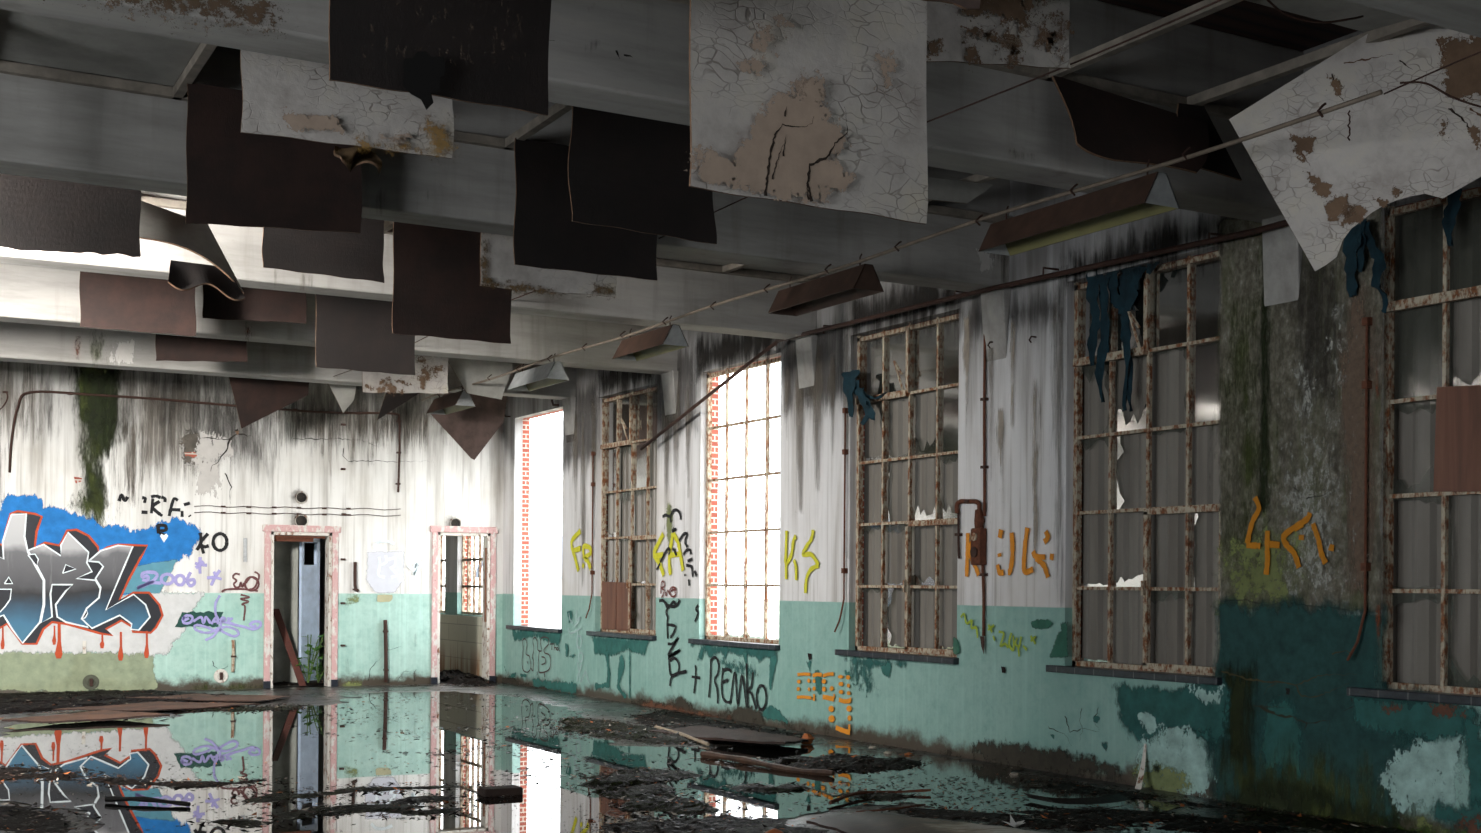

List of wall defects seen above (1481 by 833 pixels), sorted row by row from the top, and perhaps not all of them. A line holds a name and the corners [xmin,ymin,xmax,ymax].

peeling [684,67,861,206]
crack [764,107,848,202]
peeling [945,0,1076,70]
crack [1331,38,1481,143]
peeling [1435,35,1481,101]
peeling [1467,125,1481,150]
leakage [0,366,51,433]
leakage [75,336,262,493]
leakage [1115,207,1481,833]
peeling [1188,684,1225,705]
peeling [1132,712,1217,799]
peeling [1377,701,1481,833]